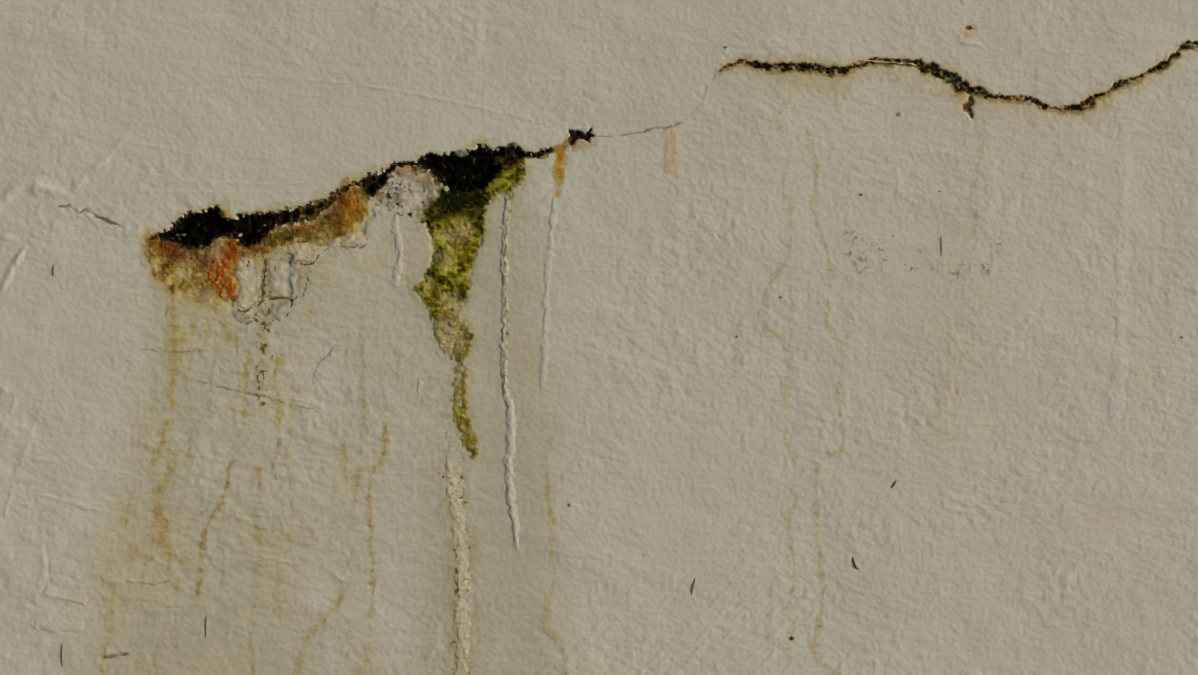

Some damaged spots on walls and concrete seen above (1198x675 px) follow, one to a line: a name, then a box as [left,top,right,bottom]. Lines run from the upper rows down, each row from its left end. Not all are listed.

rust [268,170,377,251]
flaking render [374,160,441,224]
rust [552,148,569,200]
crack [58,38,1198,267]
rust [135,225,253,322]
flaking render [229,230,370,338]
water stain [44,159,601,675]
water stain [757,91,895,675]